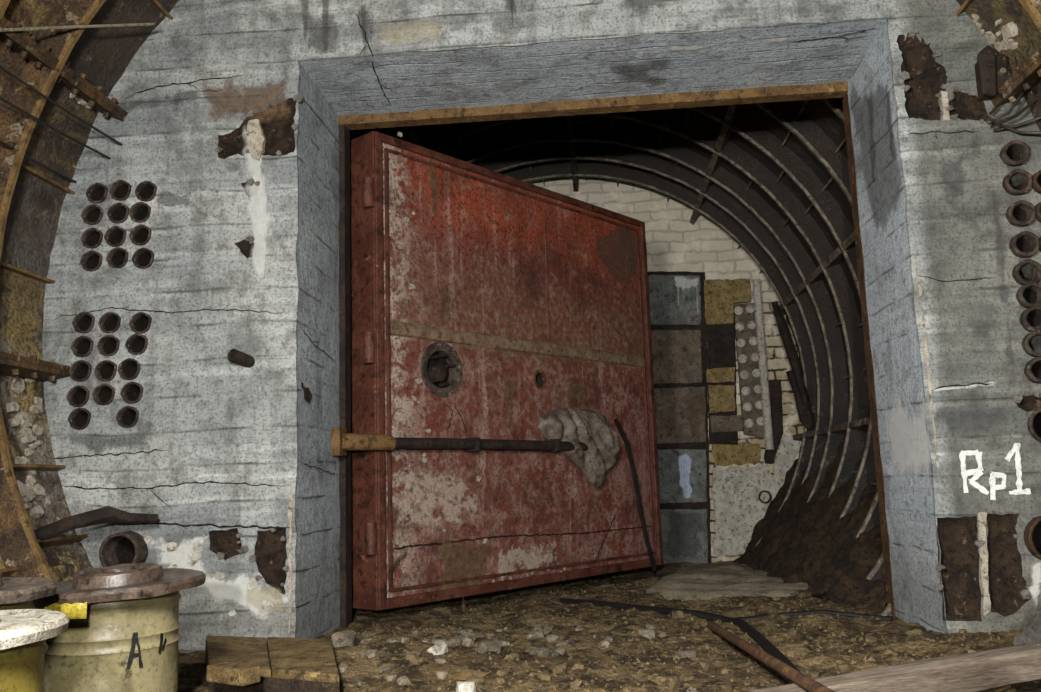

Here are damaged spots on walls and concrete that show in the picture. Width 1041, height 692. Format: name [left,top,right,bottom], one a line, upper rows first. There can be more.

crack [355,13,394,105]
spalling [897,30,988,123]
spalling [215,93,303,161]
flaking render [143,485,293,633]
spalling [935,510,1031,622]